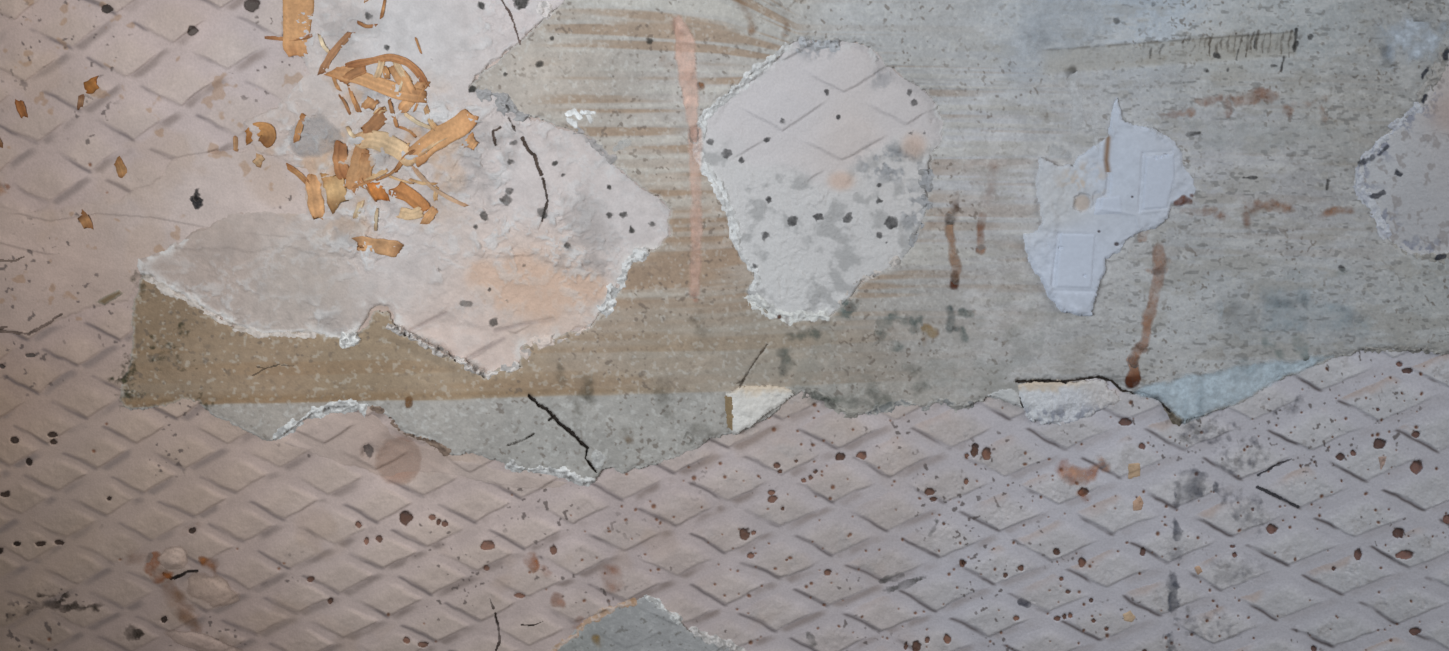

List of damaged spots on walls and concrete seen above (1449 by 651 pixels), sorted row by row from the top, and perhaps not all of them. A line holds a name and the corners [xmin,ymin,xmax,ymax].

spalling [137,0,670,380]
crack [492,117,549,222]
spalling [692,37,943,326]
spalling [1353,52,1449,265]
corrosion [946,205,961,289]
corrosion [1125,303,1153,388]
spalling [1364,346,1435,373]
spalling [273,398,606,489]
crack [507,394,597,473]
peeling [724,379,1132,434]
spalling [1164,406,1184,426]
spalling [551,595,746,651]